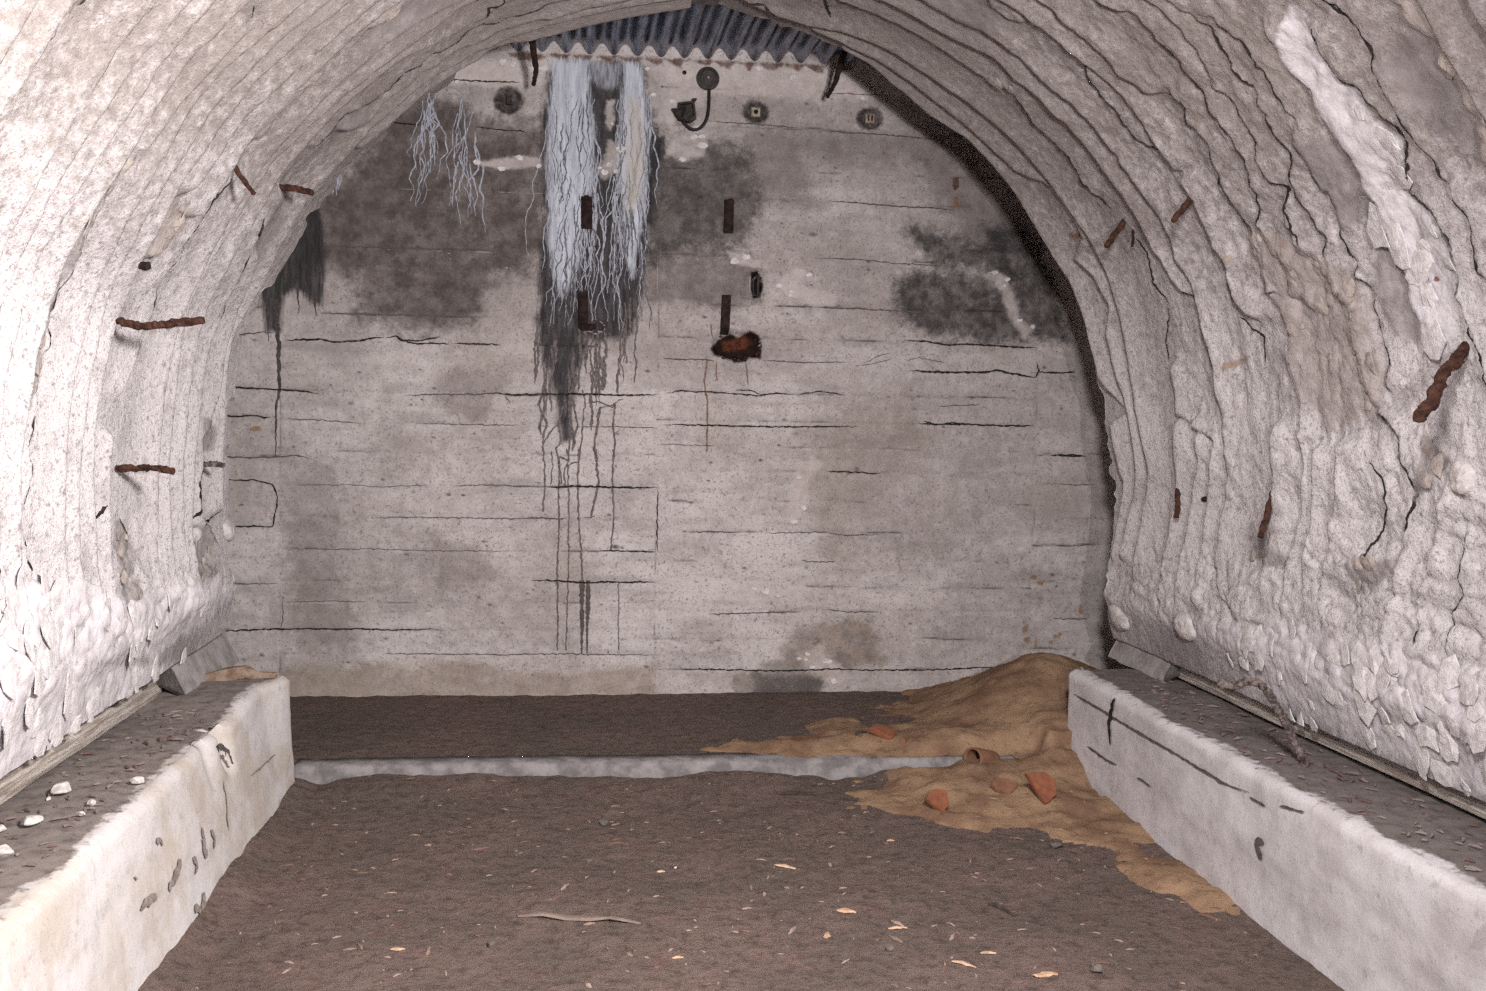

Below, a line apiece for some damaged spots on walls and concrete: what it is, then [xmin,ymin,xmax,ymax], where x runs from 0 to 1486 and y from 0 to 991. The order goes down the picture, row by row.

crack [711,121,939,140]
crack [833,201,955,210]
crack [815,258,947,266]
water stain [896,226,1068,343]
crack [221,306,498,346]
water stain [262,59,760,653]
crack [227,386,353,423]
corrosion [703,360,718,452]
crack [193,455,659,584]
crack [693,531,878,563]